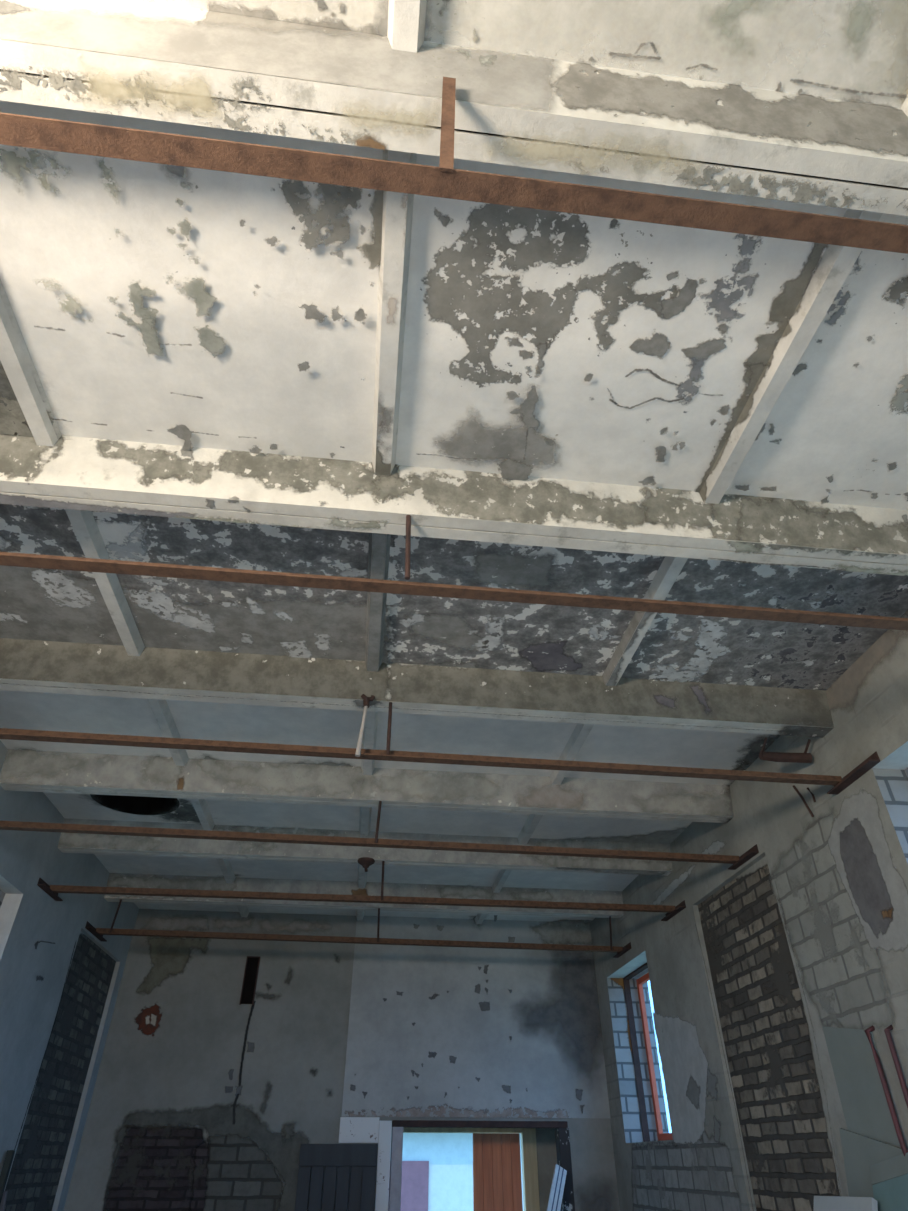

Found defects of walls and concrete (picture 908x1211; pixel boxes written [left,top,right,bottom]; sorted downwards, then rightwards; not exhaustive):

peeling [109,182,225,357]
crack [608,369,722,409]
peeling [31,569,96,608]
peeling [129,577,215,633]
peeling [280,633,330,658]
peeling [468,614,505,655]
peeling [649,619,732,682]
peeling [828,790,908,952]
damp [136,916,331,994]
damp [521,920,602,1075]
flaking render [653,865,841,1211]
flaking render [103,1125,283,1211]